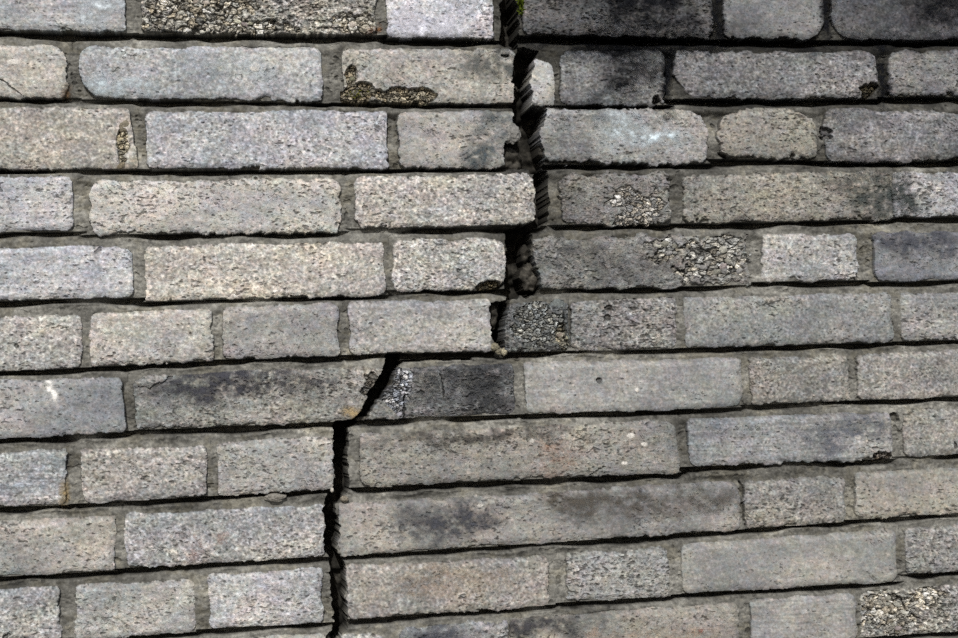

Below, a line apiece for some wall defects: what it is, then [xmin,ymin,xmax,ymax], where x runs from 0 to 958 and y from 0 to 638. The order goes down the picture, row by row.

crack [322,0,551,638]